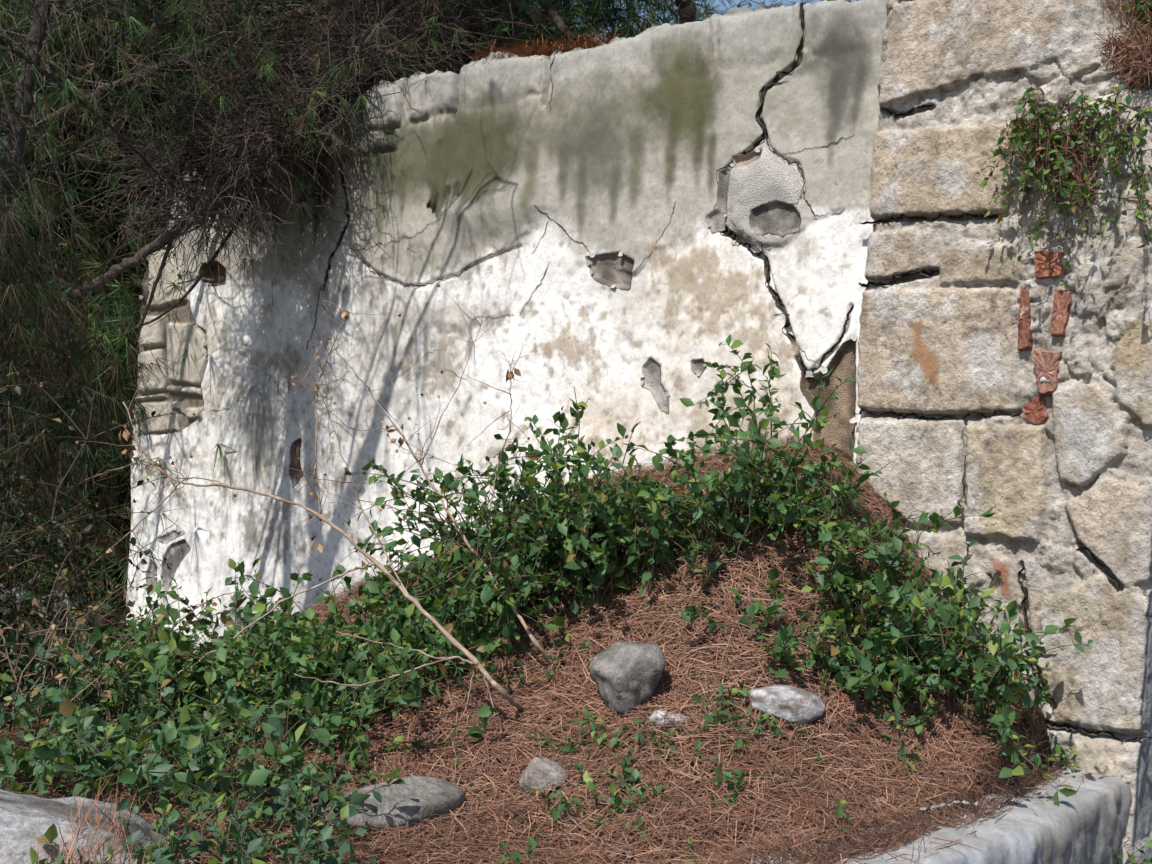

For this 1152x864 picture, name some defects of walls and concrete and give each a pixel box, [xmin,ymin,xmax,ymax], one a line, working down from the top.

water stain [819,24,863,139]
crack [306,145,591,350]
water stain [560,115,640,214]
spalling [585,251,634,290]
crack [633,201,676,273]
water stain [667,120,677,183]
water stain [695,123,714,183]
spalling [749,200,801,236]
crack [714,2,998,380]
spalling [133,245,207,435]
spalling [800,333,858,461]
spalling [145,530,190,595]